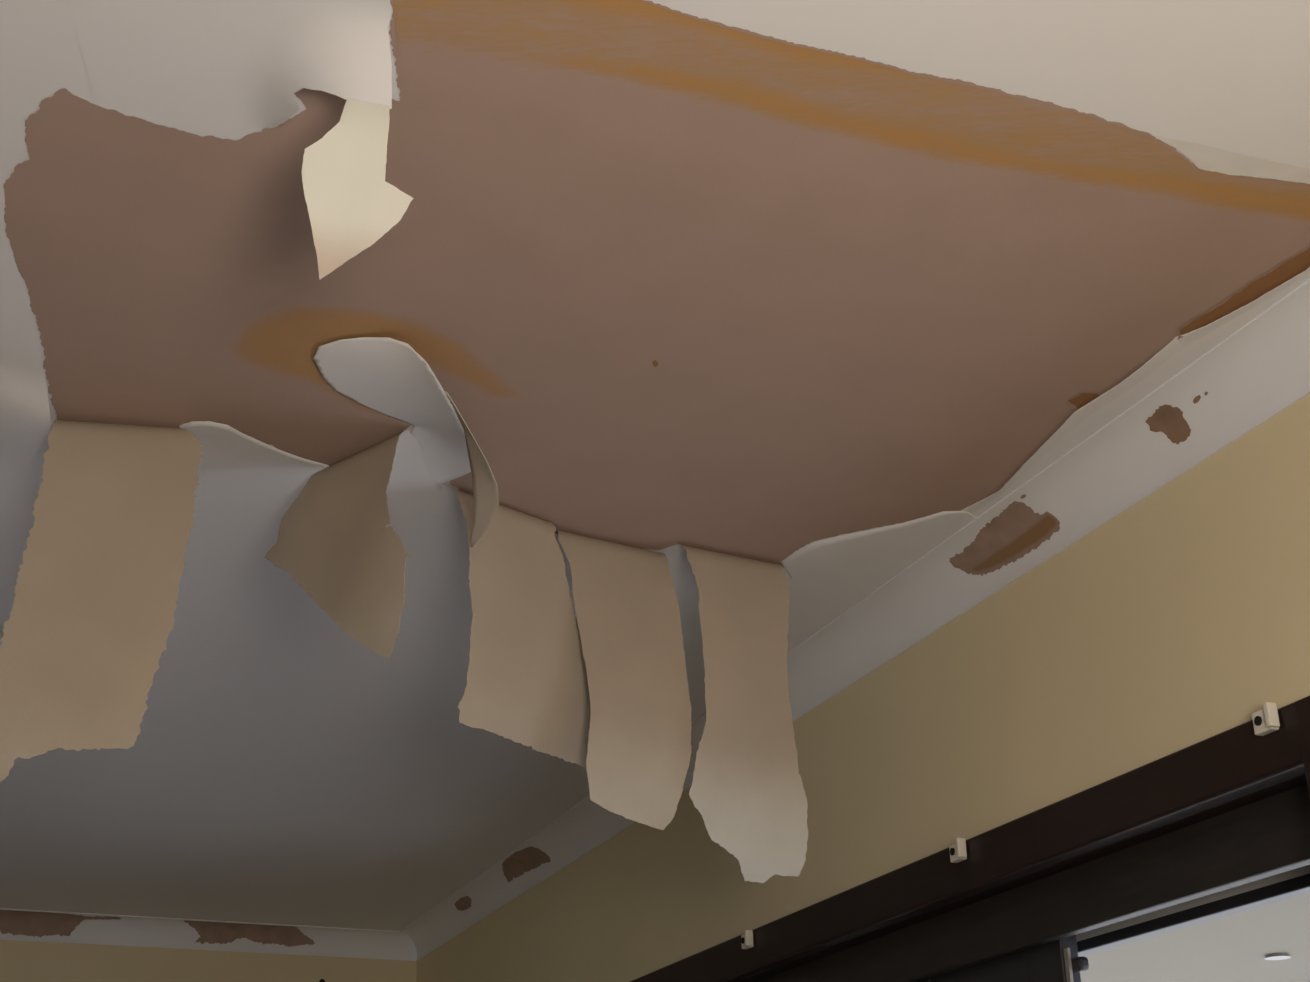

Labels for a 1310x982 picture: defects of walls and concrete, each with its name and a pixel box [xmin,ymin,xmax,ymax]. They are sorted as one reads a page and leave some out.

leakage [393,0,1310,229]
leakage [222,299,538,425]
peeling [0,0,1310,783]
peeling [556,529,692,830]
peeling [682,545,808,883]
peeling [0,910,122,937]
peeling [184,920,314,947]
peeling [502,846,550,882]